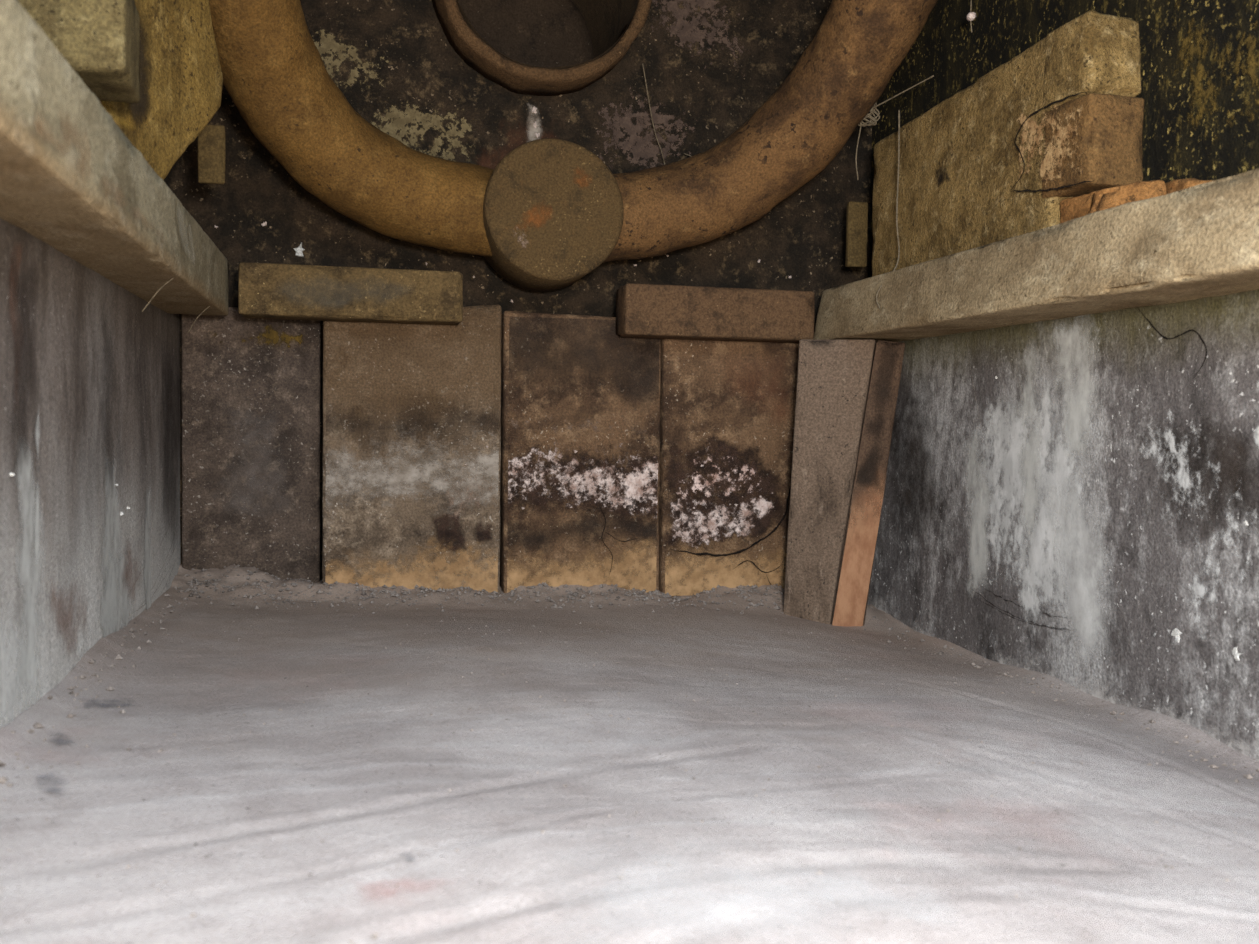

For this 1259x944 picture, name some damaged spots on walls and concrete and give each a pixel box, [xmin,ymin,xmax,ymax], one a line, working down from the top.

leakage [1175,17,1259,130]
leakage [0,416,42,722]
leakage [967,327,1103,657]